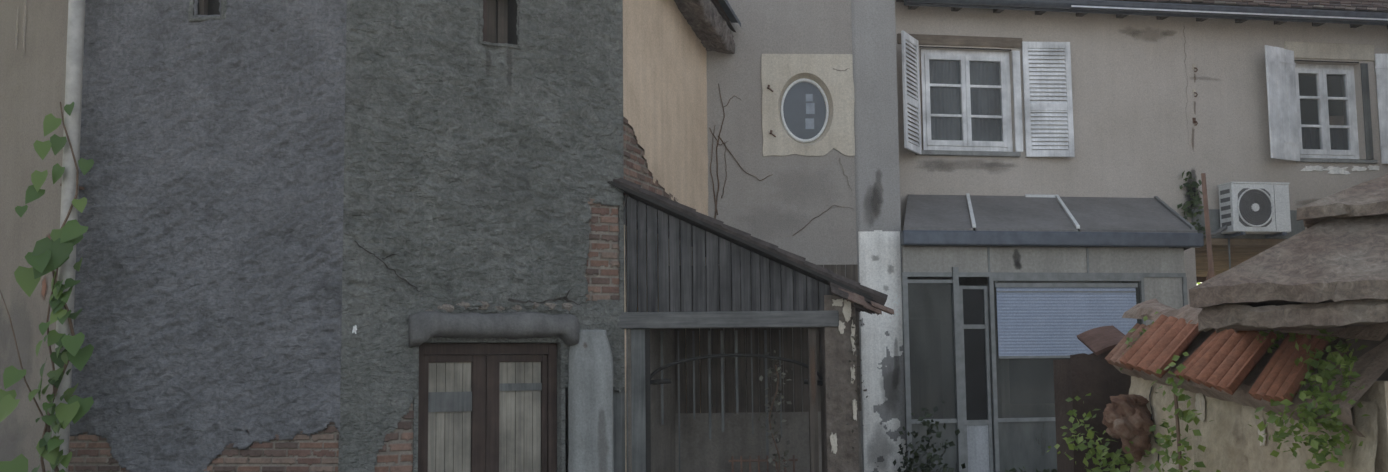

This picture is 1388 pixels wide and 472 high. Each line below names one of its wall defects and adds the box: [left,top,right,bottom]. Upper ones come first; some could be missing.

spalling [623,116,677,226]
crack [355,240,423,292]
spalling [425,301,581,314]
crack [508,289,581,305]
peeling [829,230,906,472]
spalling [204,422,339,472]
spalling [375,403,414,472]